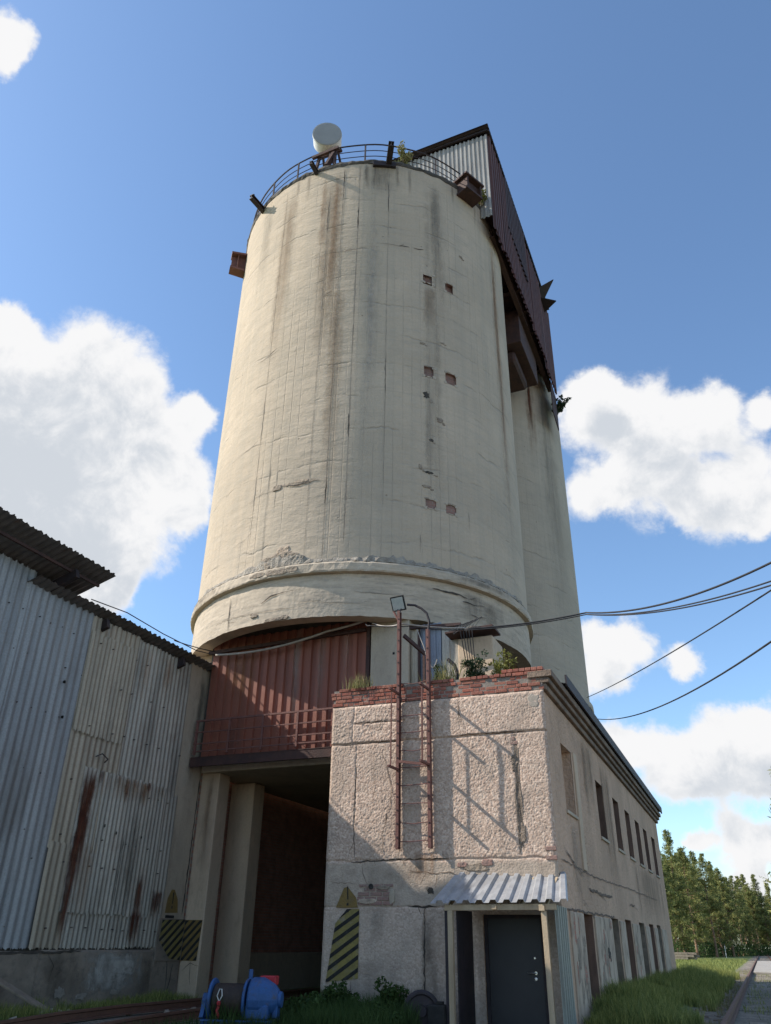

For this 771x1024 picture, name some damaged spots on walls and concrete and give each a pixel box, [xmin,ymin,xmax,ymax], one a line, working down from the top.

spalling [249,545,305,579]
rust [60,772,104,926]
rust [129,881,162,937]
flaking render [357,884,395,905]